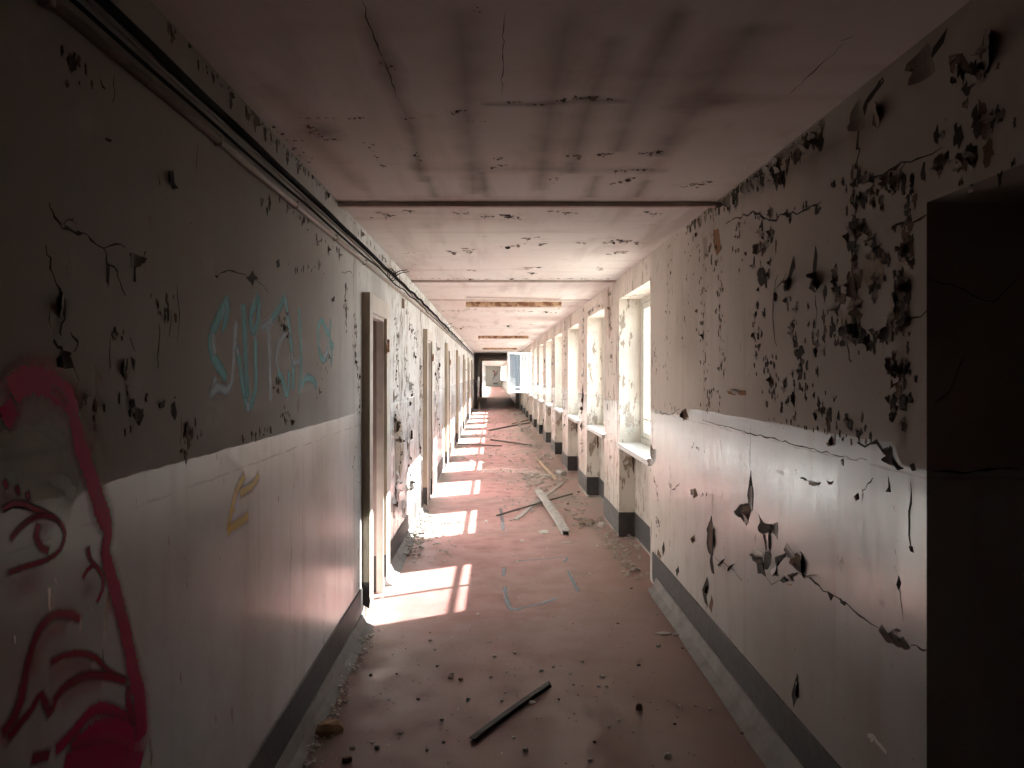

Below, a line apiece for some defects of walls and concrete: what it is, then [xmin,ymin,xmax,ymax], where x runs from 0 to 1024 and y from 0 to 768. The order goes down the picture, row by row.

crack [45,202,126,336]
crack [725,201,821,225]
spalling [684,27,1016,447]
crack [862,146,943,185]
spalling [53,332,105,433]
peeling [109,327,148,436]
peeling [391,309,424,519]
spalling [690,516,742,613]
spalling [734,470,806,585]
crack [803,574,878,628]
crack [703,420,1021,553]
crack [895,576,903,614]